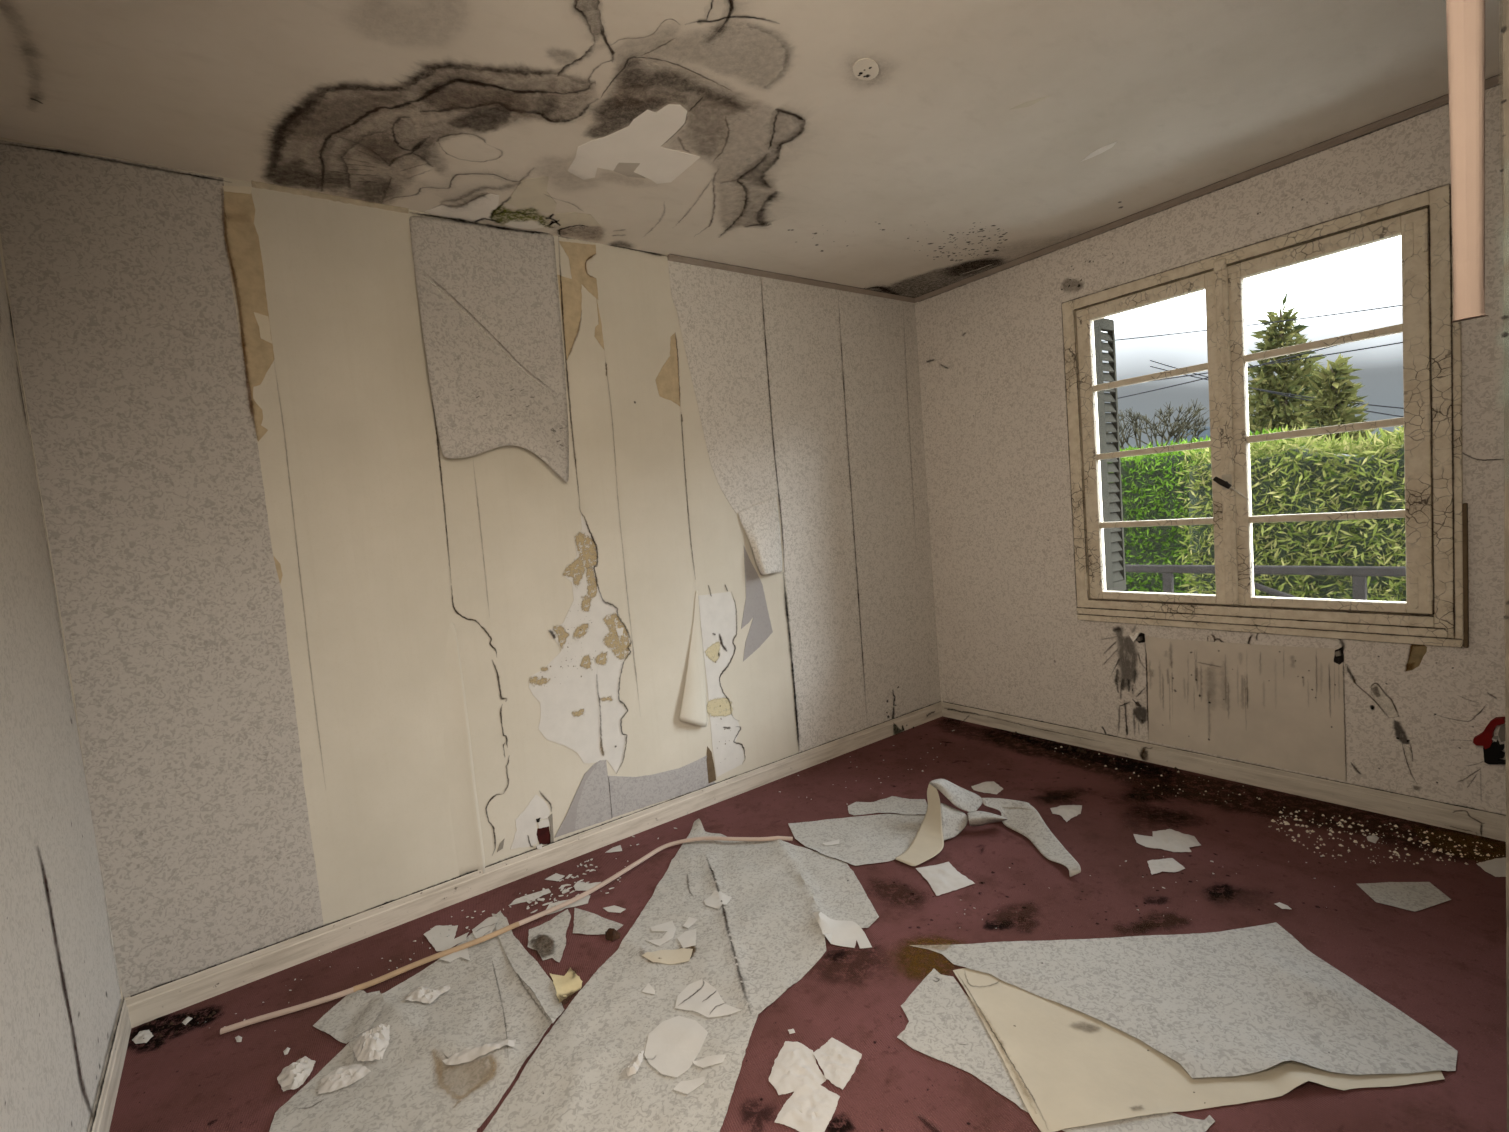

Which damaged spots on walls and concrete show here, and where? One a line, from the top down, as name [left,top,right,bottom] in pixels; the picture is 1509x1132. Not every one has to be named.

water stain [268,26,737,197]
water stain [706,109,804,235]
peeling [222,186,275,441]
peeling [655,333,680,406]
water stain [867,222,1008,298]
spalling [497,513,631,852]
spalling [679,585,745,777]
water stain [1102,628,1147,734]
water stain [985,728,1506,862]
water stain [1356,683,1418,789]
crack [39,852,91,1110]